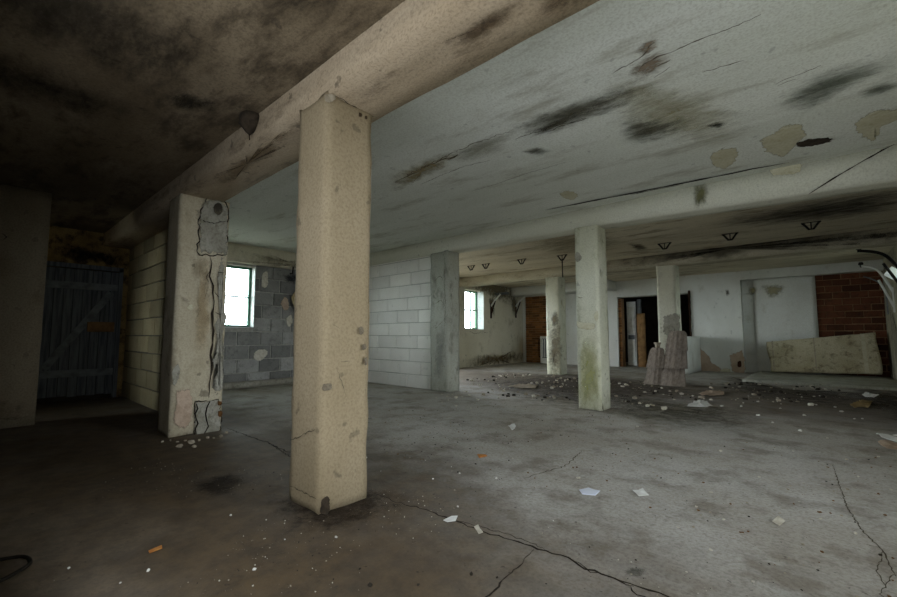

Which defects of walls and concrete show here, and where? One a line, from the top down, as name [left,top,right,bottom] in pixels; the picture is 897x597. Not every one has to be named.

leakage [535,90,630,131]
leakage [629,99,694,138]
peeling [760,124,806,176]
leakage [796,72,868,105]
crack [809,144,894,194]
peeling [855,109,897,141]
spalling [172,198,229,435]
crack [194,258,314,457]
crack [374,493,670,597]
crack [832,465,896,597]